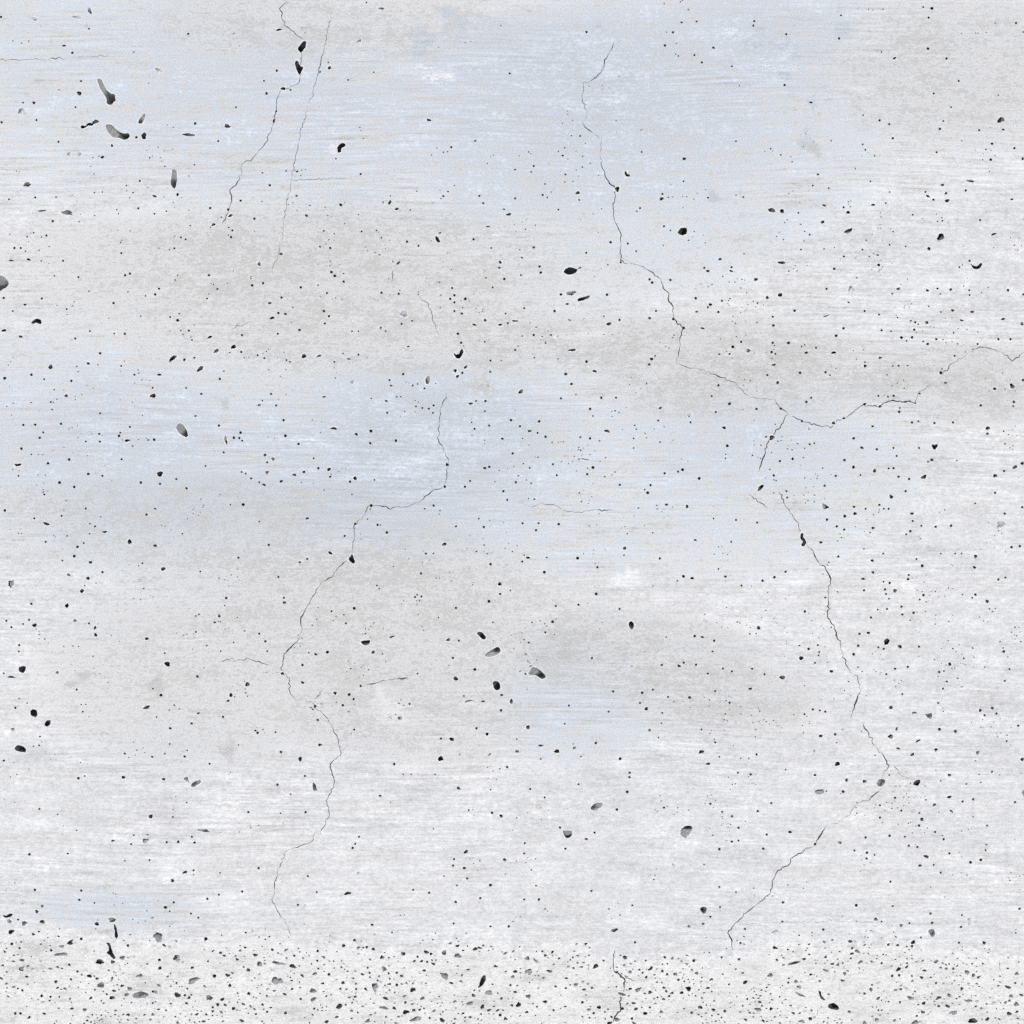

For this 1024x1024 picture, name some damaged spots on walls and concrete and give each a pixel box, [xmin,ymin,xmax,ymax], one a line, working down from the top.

crack [222,2,314,223]
crack [581,43,1024,470]
crack [219,397,449,934]
crack [727,493,912,949]